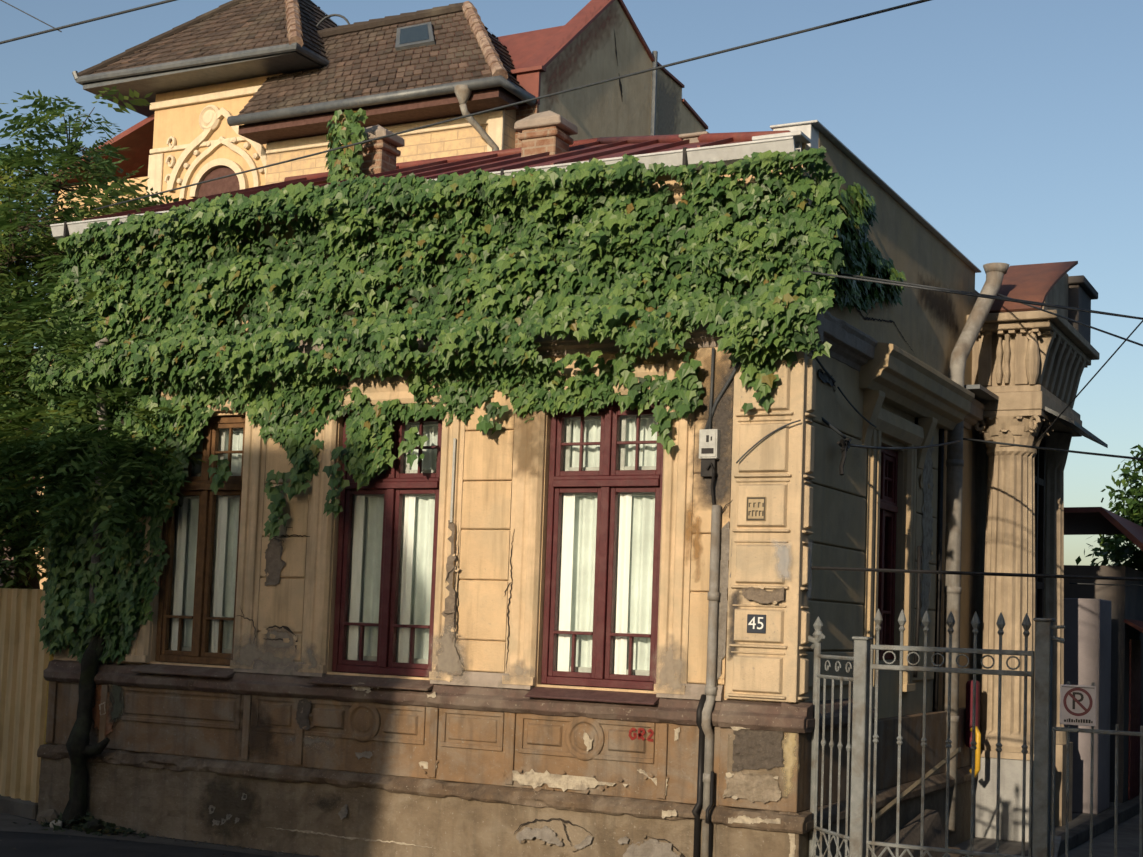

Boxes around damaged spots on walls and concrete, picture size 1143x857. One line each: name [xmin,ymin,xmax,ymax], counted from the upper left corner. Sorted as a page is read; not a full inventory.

flaking render [263,534,286,586]
flaking render [433,519,462,682]
peeling [500,769,628,794]
flaking render [723,726,784,804]
peeling [728,815,796,857]